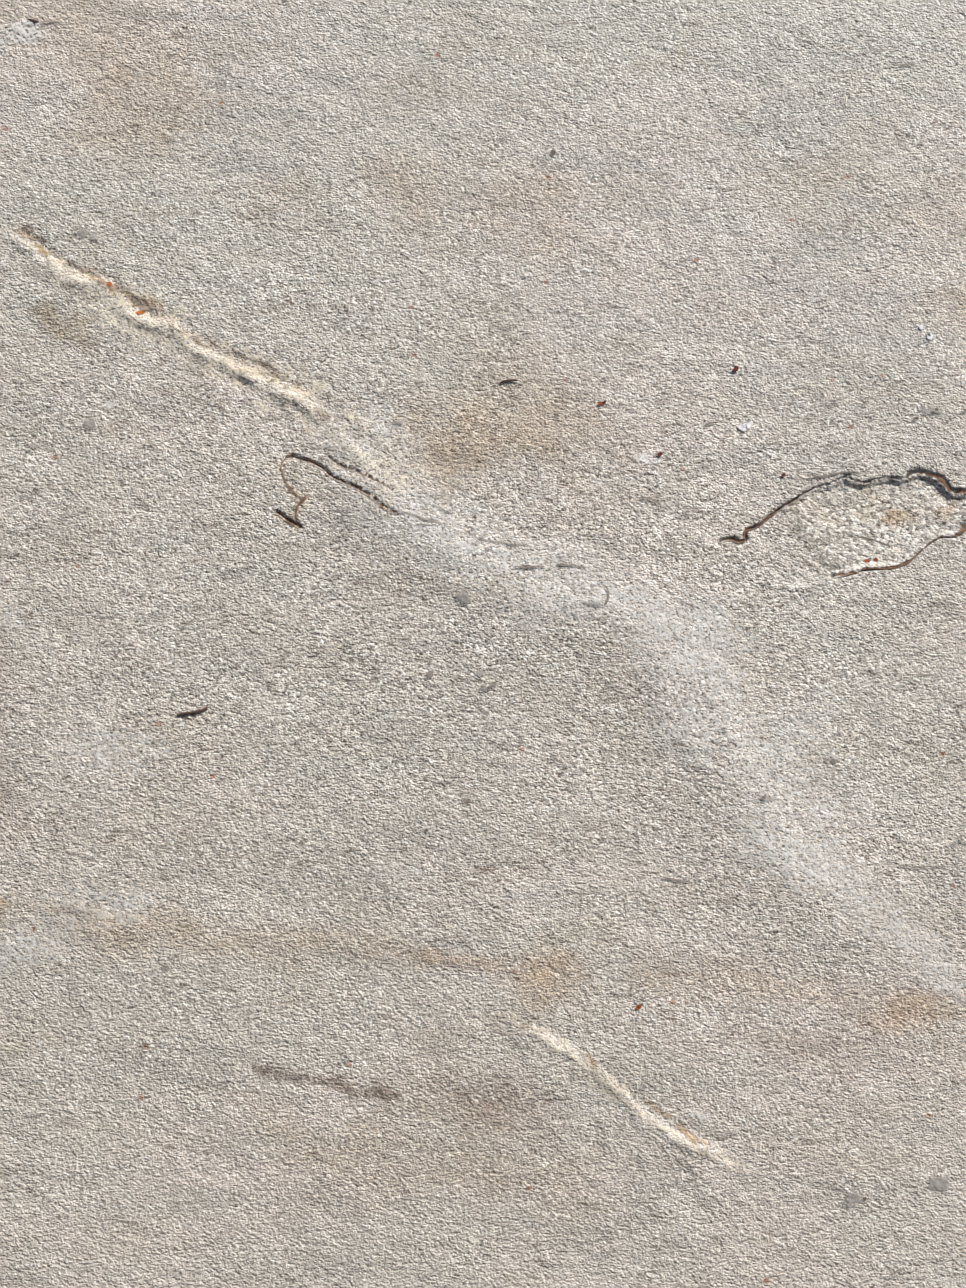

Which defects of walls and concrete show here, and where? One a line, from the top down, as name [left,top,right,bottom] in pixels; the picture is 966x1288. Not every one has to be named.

crack [280,453,454,525]
crack [476,537,527,546]